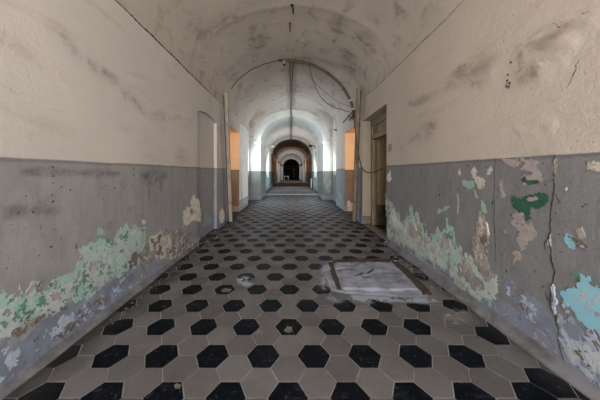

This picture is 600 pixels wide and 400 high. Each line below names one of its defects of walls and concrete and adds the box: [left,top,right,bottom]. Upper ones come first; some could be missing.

peeling [0,194,202,340]
peeling [385,166,498,307]
peeling [502,157,543,186]
peeling [499,179,549,265]
crack [544,156,564,361]
peeling [563,227,589,250]
peeling [586,160,600,172]
flaking render [557,271,600,387]